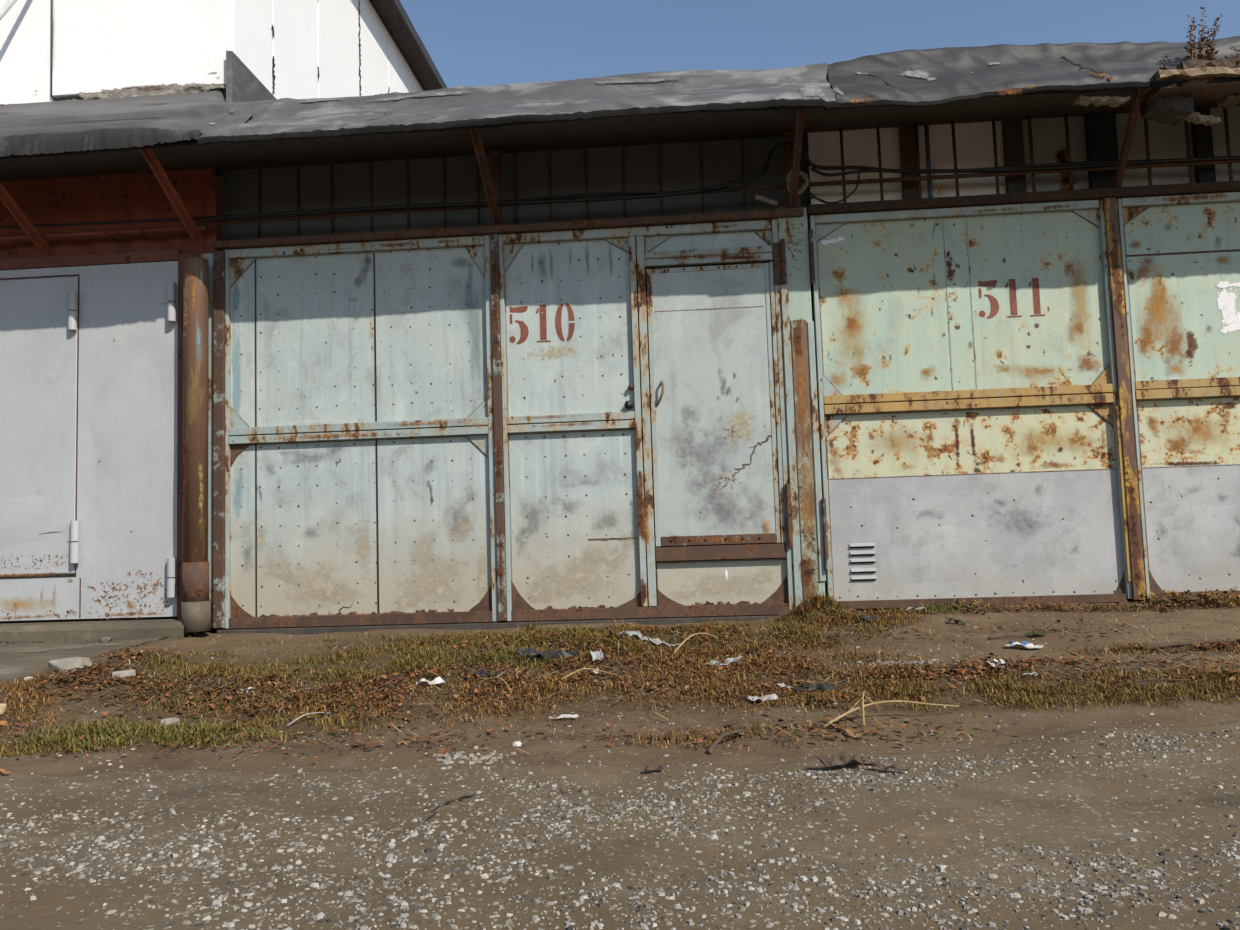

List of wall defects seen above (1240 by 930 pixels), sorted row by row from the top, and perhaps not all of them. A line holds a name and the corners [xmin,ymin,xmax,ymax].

corrosion [921,252,972,342]
corrosion [1110,224,1150,337]
corrosion [1141,289,1198,372]
peeling [1216,281,1240,334]
crack [722,435,777,489]
corrosion [955,419,981,472]
corrosion [1149,418,1217,466]
corrosion [636,470,648,540]
corrosion [1128,486,1142,589]
corrosion [0,555,67,577]
corrosion [88,570,168,620]
corrosion [800,559,814,586]